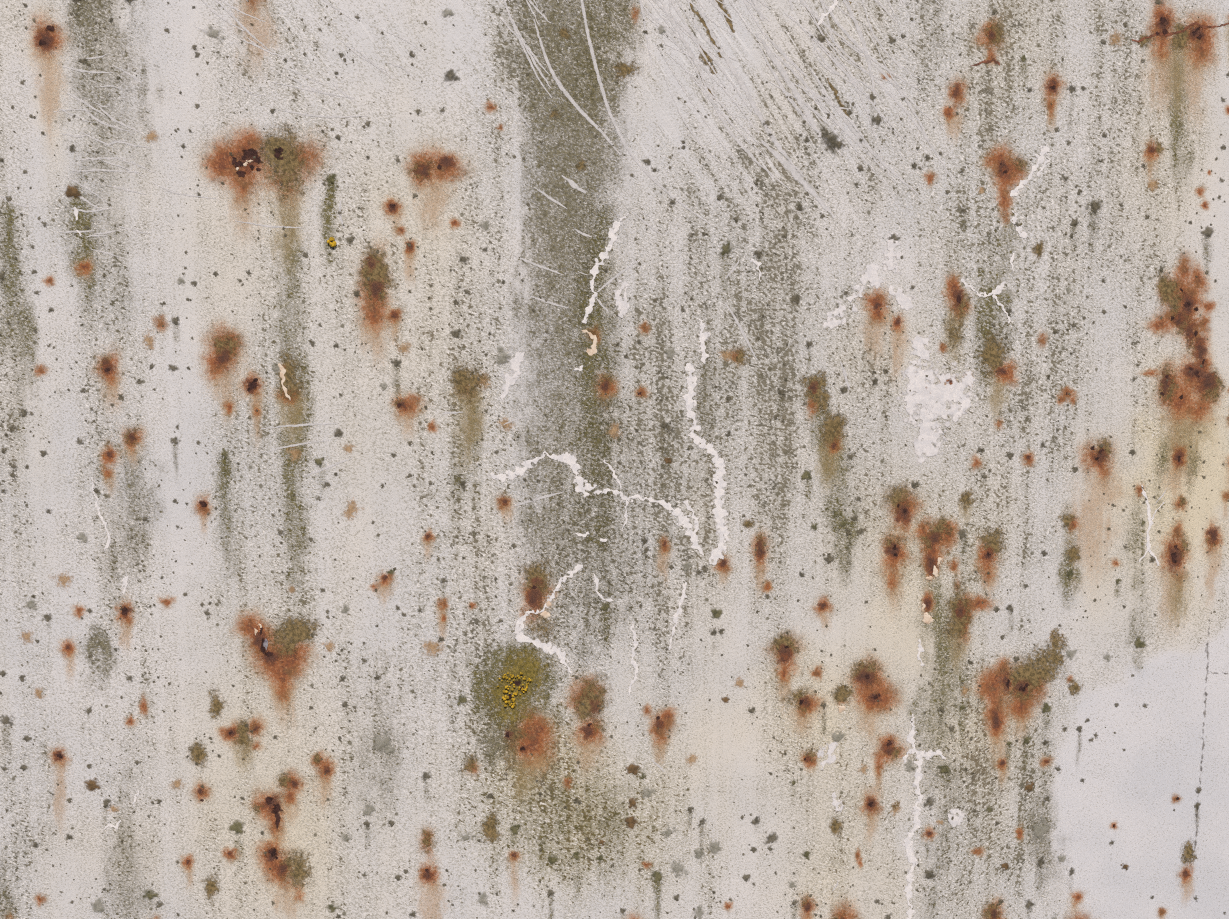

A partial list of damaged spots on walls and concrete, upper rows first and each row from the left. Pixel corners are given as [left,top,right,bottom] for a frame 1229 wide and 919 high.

corrosion [1138,0,1215,87]
corrosion [203,123,321,247]
corrosion [407,151,463,186]
corrosion [979,144,1028,223]
corrosion [358,248,401,330]
corrosion [1144,255,1229,469]
corrosion [882,485,1005,657]
corrosion [238,615,334,702]
corrosion [770,630,899,717]
corrosion [962,628,1083,737]
corrosion [312,752,334,782]
corrosion [252,772,312,900]